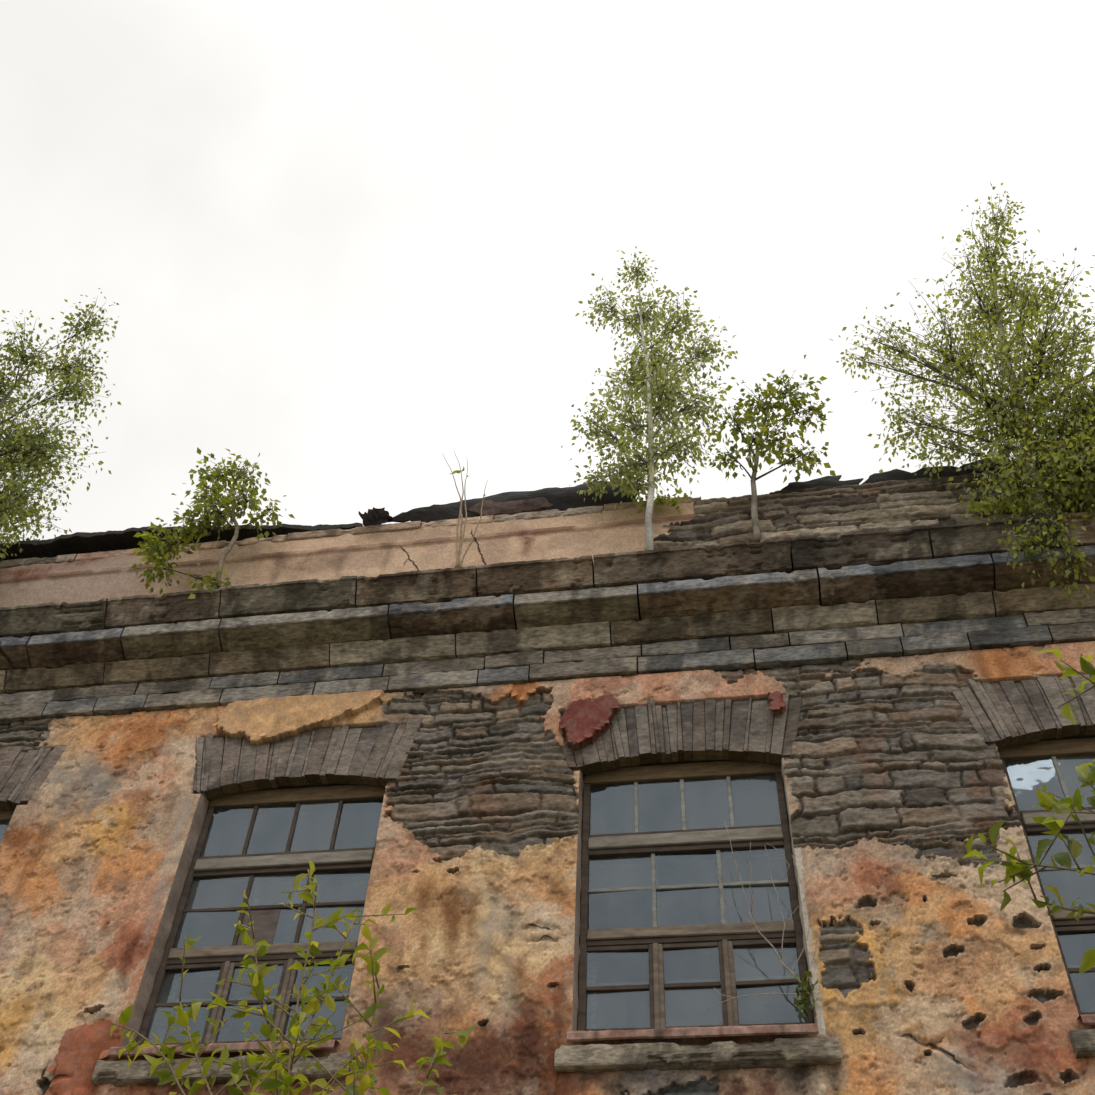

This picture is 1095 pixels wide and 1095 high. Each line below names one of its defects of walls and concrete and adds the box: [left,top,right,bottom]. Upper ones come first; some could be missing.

spalling [212,682,621,875]
spalling [714,659,1022,879]
spalling [967,914,987,927]
hole [1012,913,1040,929]
spalling [818,894,880,998]
hole [942,944,965,958]
hole [961,1012,987,1030]
hole [1024,988,1065,1025]
flaking render [36,1004,121,1095]
crack [41,1064,69,1095]
hole [1005,1070,1049,1095]
hole [1060,1068,1078,1084]